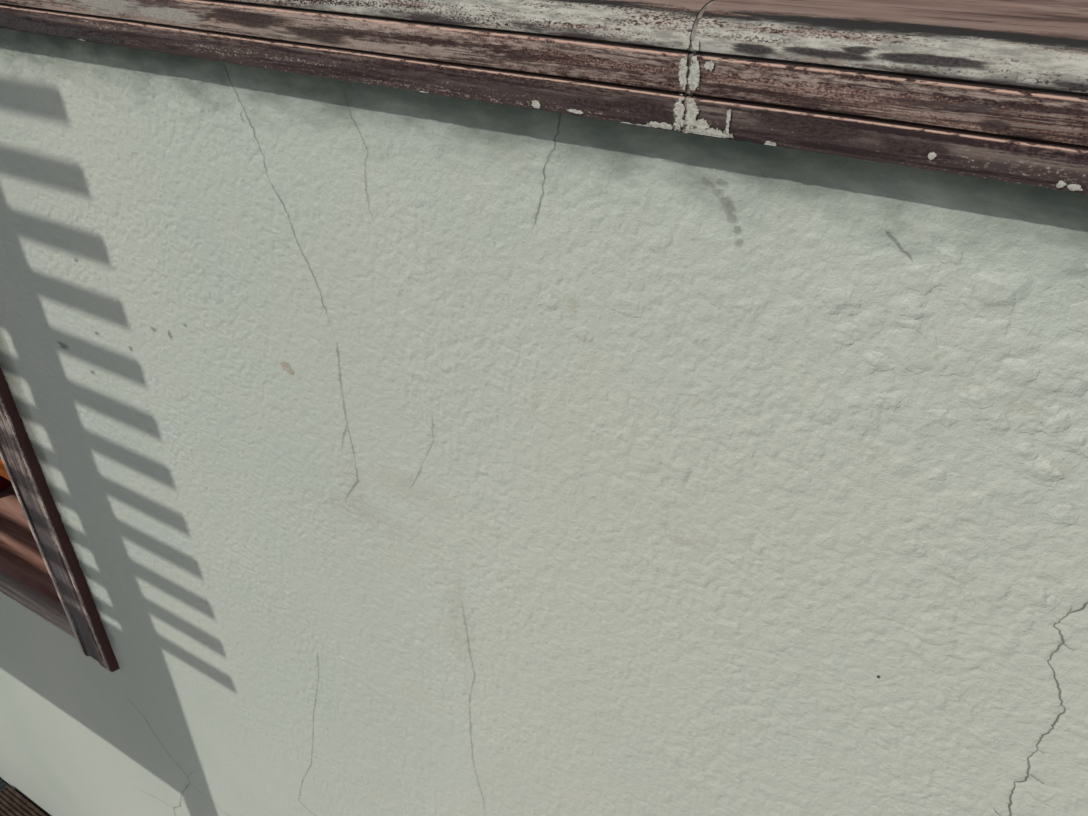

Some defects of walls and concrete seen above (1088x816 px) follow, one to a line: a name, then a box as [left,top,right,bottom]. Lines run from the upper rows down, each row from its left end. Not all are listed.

peeling [565,35,733,138]
peeling [757,113,956,160]
peeling [1056,180,1083,191]
crack [994,602,1088,816]